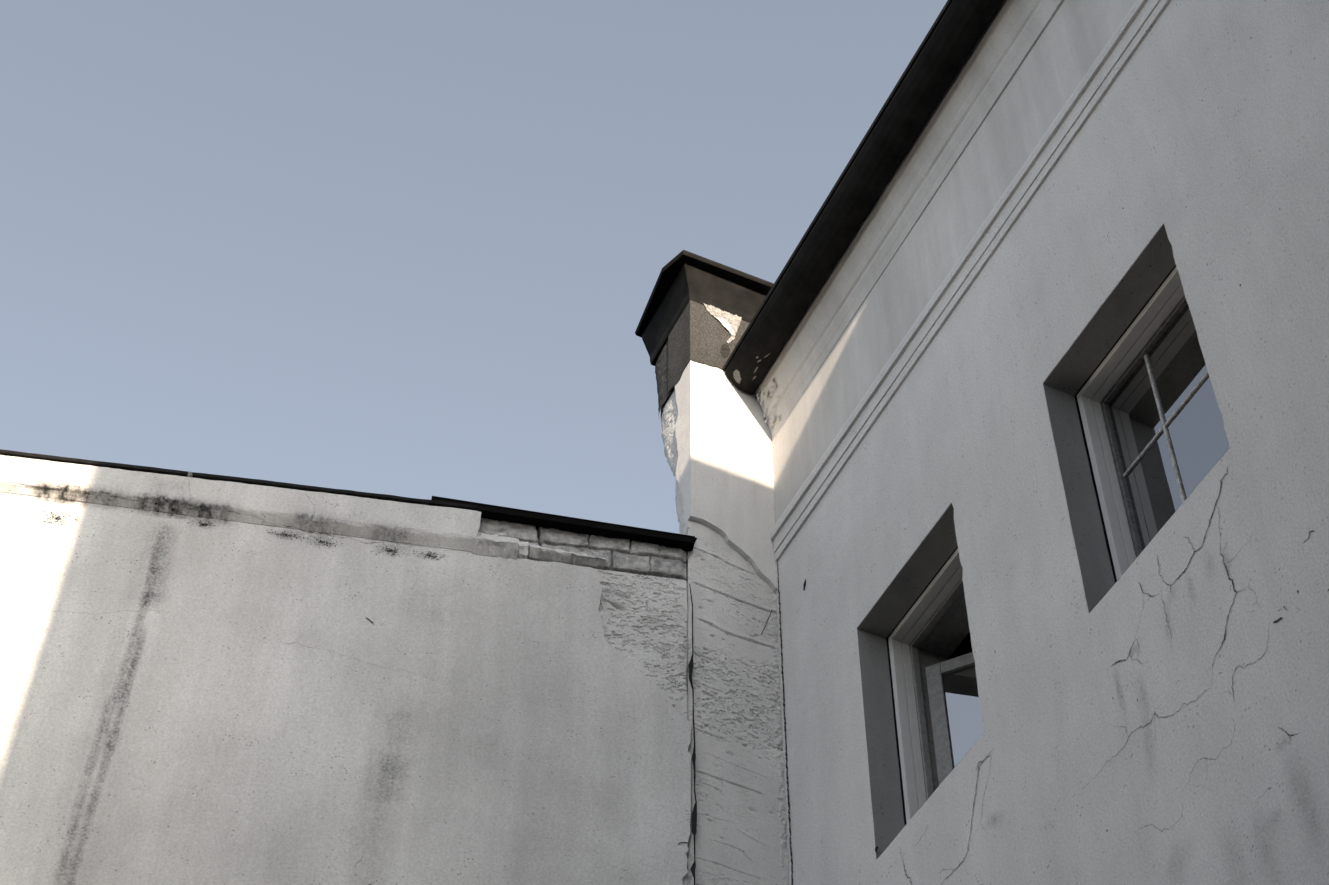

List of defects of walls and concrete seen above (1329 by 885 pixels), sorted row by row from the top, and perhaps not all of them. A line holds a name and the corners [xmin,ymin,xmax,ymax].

spalling [591,520,789,885]
crack [945,747,995,879]
crack [1127,466,1264,740]